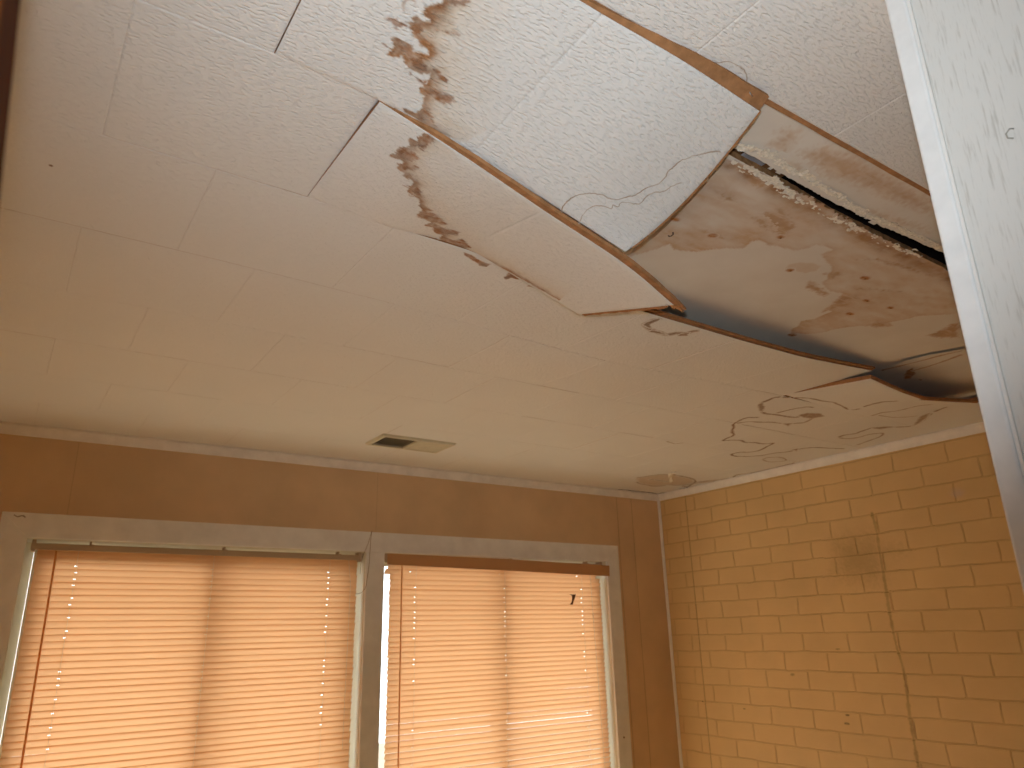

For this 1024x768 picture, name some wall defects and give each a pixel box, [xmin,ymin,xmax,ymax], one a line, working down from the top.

damp [380,0,575,301]
damp [561,124,965,381]
peeling [731,143,943,258]
damp [633,396,948,487]
crack [870,511,921,768]